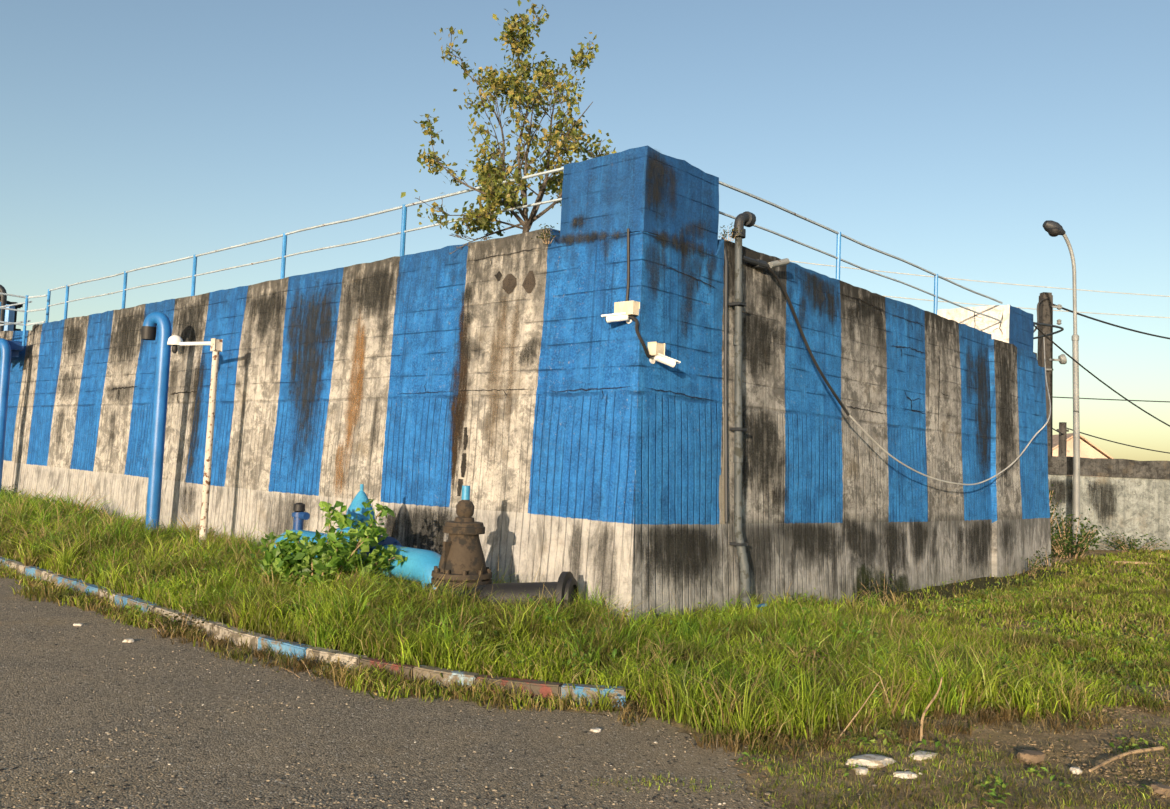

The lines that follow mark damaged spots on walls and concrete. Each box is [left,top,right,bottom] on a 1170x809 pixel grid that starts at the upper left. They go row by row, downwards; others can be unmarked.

leakage [248,269,398,456]
rust [335,320,365,487]
leakage [450,287,537,487]
leakage [734,314,784,377]
leakage [742,396,785,505]
crack [842,294,948,425]
leakage [966,351,1016,487]
leakage [641,526,718,586]
leakage [748,518,937,597]
leakage [959,521,1011,565]